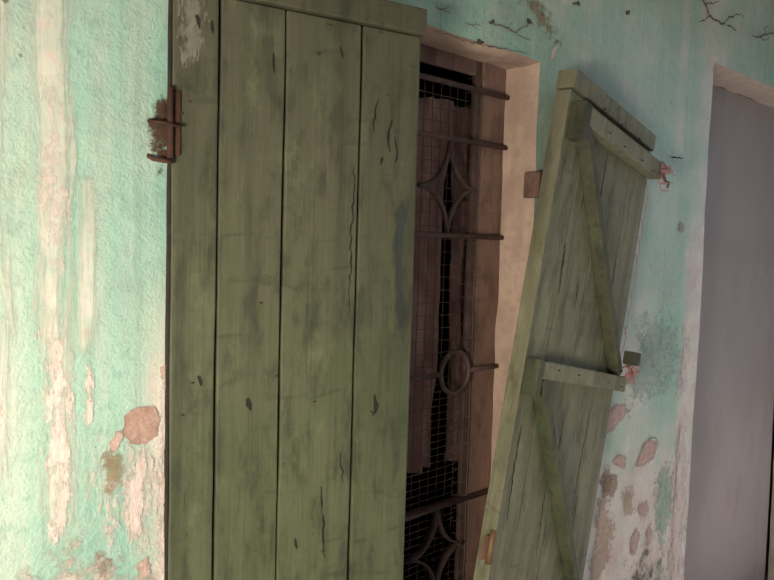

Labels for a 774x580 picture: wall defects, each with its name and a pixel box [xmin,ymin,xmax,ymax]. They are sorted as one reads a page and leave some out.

crack [434,7,532,55]
crack [699,0,743,30]
crack [753,25,774,41]
rust [148,99,167,159]
peeling [41,328,94,545]
peeling [50,406,165,580]
peeling [587,440,675,580]
damp [625,549,662,580]